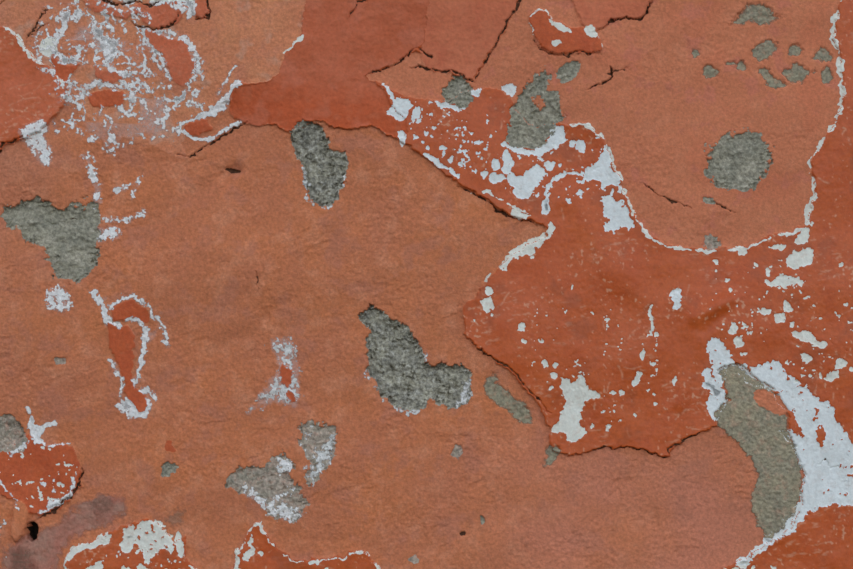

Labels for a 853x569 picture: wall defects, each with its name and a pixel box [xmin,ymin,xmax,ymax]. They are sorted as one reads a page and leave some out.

crack [372,0,521,82]
crack [177,123,246,158]
peeling [501,125,568,162]
peeling [480,158,506,184]
peeling [501,149,548,199]
crack [464,189,531,222]
peeling [600,188,635,234]
peeling [764,247,814,294]
peeling [751,294,831,355]
peeling [601,304,659,431]
peeling [800,353,853,382]
crack [593,432,700,458]